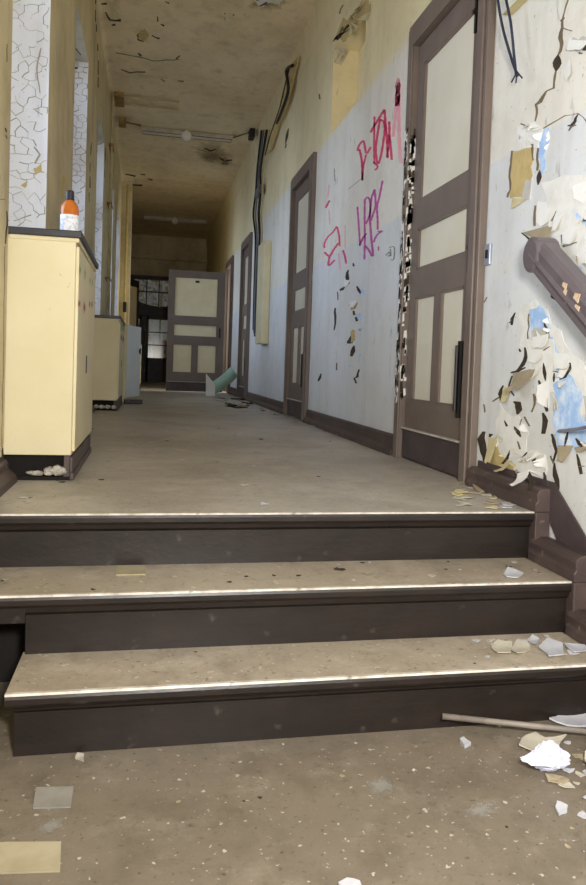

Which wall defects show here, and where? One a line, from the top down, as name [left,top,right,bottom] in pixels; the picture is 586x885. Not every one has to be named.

crack [115,52,184,82]
flaking render [333,0,371,65]
crack [535,0,586,131]
peeling [506,122,586,274]
peeling [340,263,365,383]
peeling [477,299,586,490]
peeling [451,481,516,509]